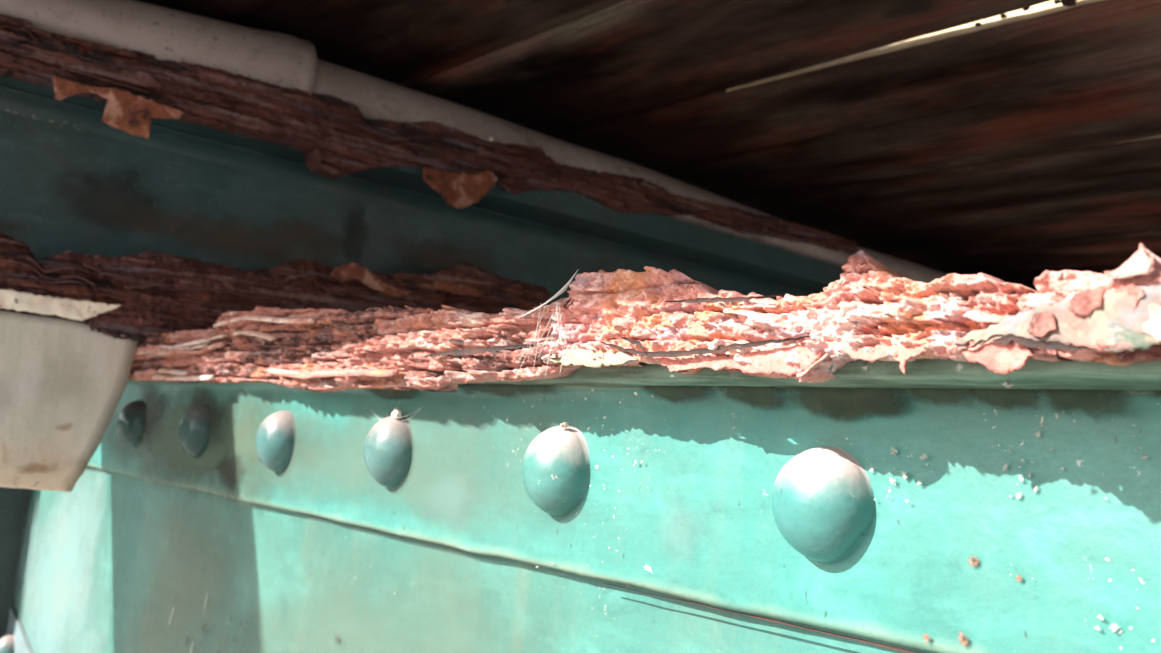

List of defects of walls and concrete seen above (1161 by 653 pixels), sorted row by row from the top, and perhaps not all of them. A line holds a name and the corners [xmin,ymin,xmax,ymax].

corrosion [52,75,186,139]
corrosion [423,168,497,209]
corrosion [316,263,484,306]
corrosion [541,250,1061,383]
peeling [945,243,1161,387]
corrosion [1029,347,1075,361]